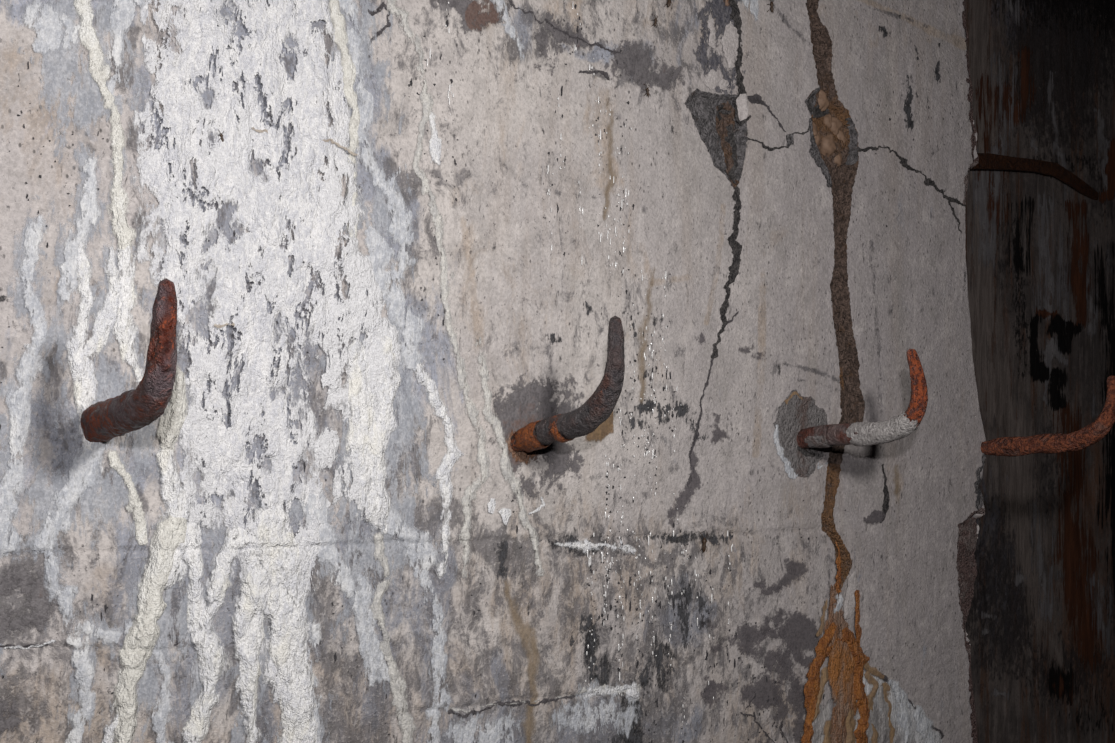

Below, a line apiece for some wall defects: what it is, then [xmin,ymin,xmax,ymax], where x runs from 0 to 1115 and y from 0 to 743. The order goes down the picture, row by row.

crack [509,0,621,80]
spalling [685,0,759,188]
leakage [969,0,1020,155]
leakage [0,0,837,743]
corrosion [514,420,574,452]
crack [668,186,766,526]
crack [723,0,966,606]
leakage [844,411,921,447]
leakage [966,107,1115,437]
crack [448,684,641,719]
corrosion [801,541,870,743]
leakage [853,662,942,743]